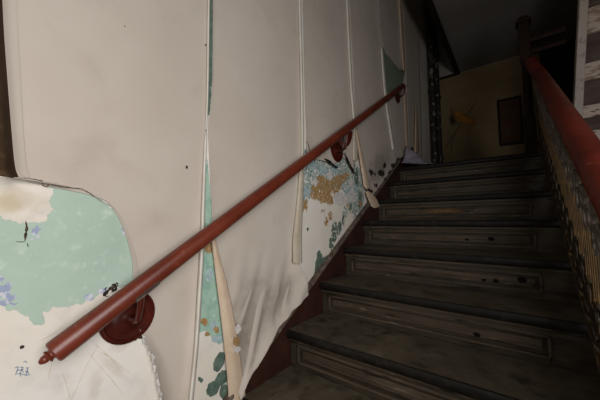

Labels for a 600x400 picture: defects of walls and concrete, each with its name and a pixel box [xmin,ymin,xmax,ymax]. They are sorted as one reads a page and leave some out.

peeling [383,47,405,93]
peeling [0,177,133,325]
peeling [303,158,364,274]
peeling [198,242,228,399]
peeling [232,324,241,354]